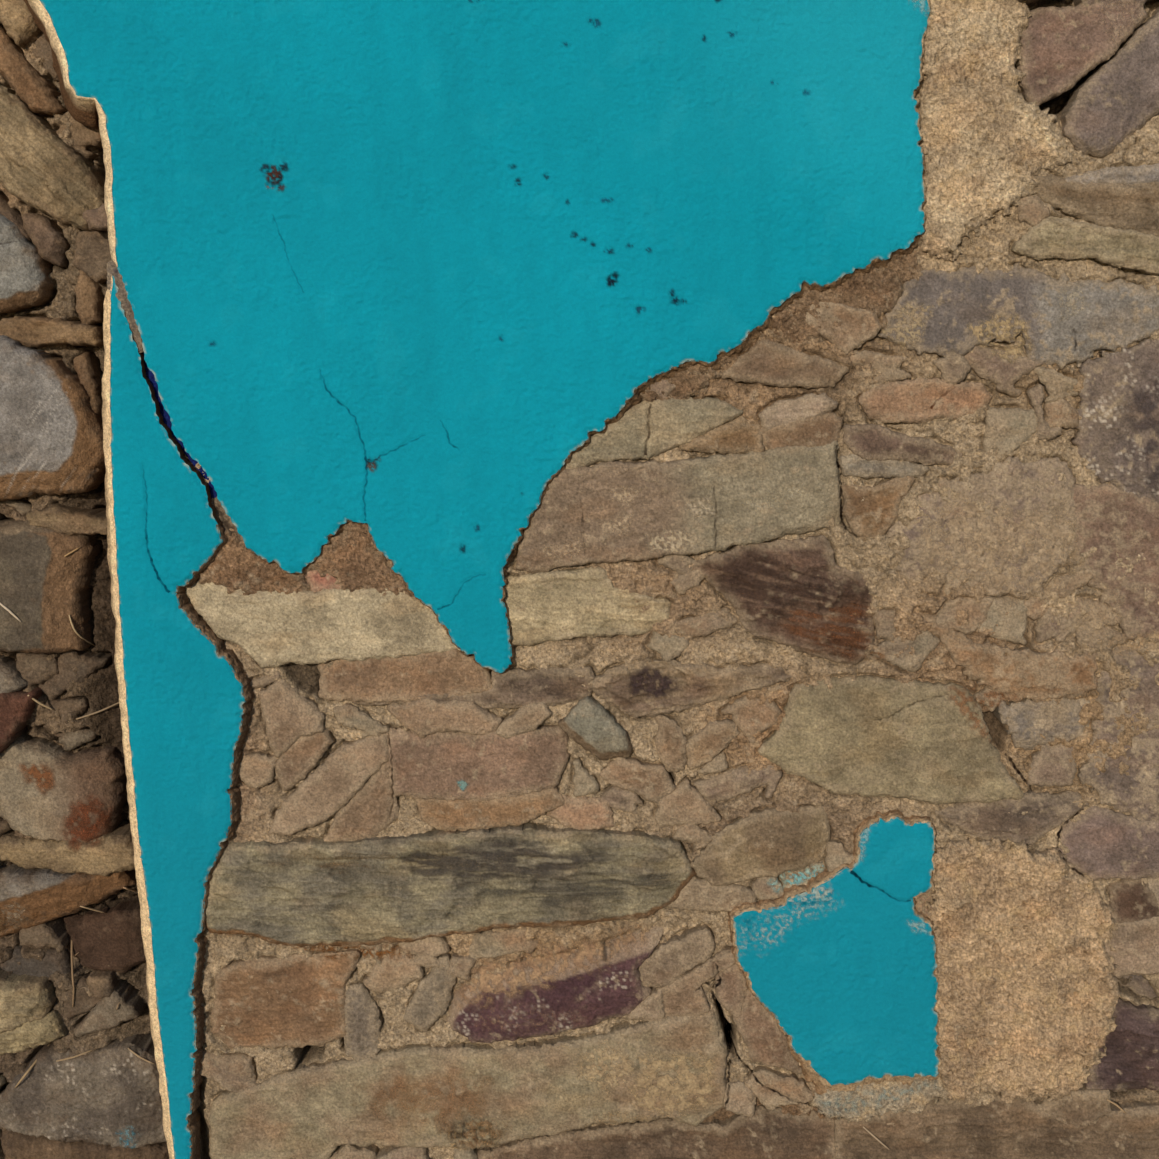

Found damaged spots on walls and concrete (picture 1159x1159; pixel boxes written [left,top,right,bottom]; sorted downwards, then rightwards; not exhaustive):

peeling [23,0,175,1159]
crack [146,535,170,593]
crack [106,260,244,542]
flaking render [174,0,1073,1159]